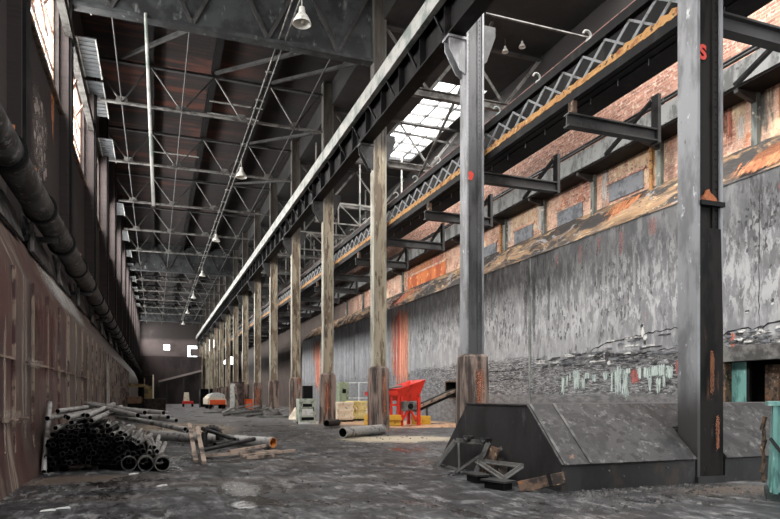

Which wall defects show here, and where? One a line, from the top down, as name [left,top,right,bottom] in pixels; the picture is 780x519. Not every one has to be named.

corrosion [732,141,780,177]
corrosion [600,194,641,227]
corrosion [383,252,447,415]
spalling [725,325,780,344]
peeling [536,324,678,398]